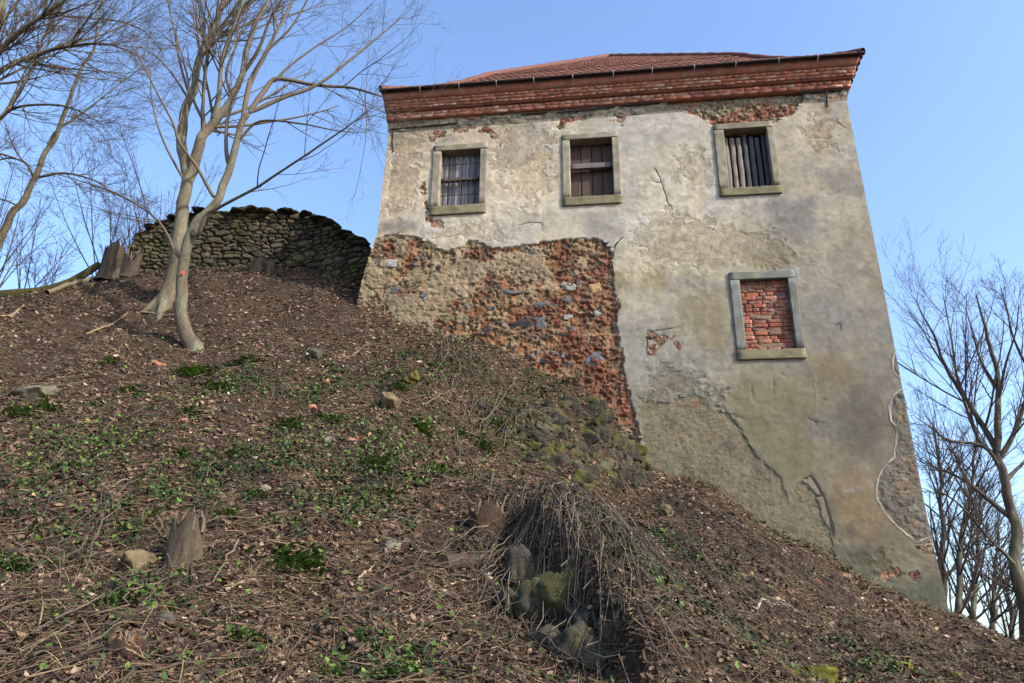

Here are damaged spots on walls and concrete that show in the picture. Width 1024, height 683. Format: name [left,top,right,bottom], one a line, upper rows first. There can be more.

spalling [671,97,838,153]
spalling [357,116,834,559]
crack [734,418,769,468]
flaking render [879,391,936,556]